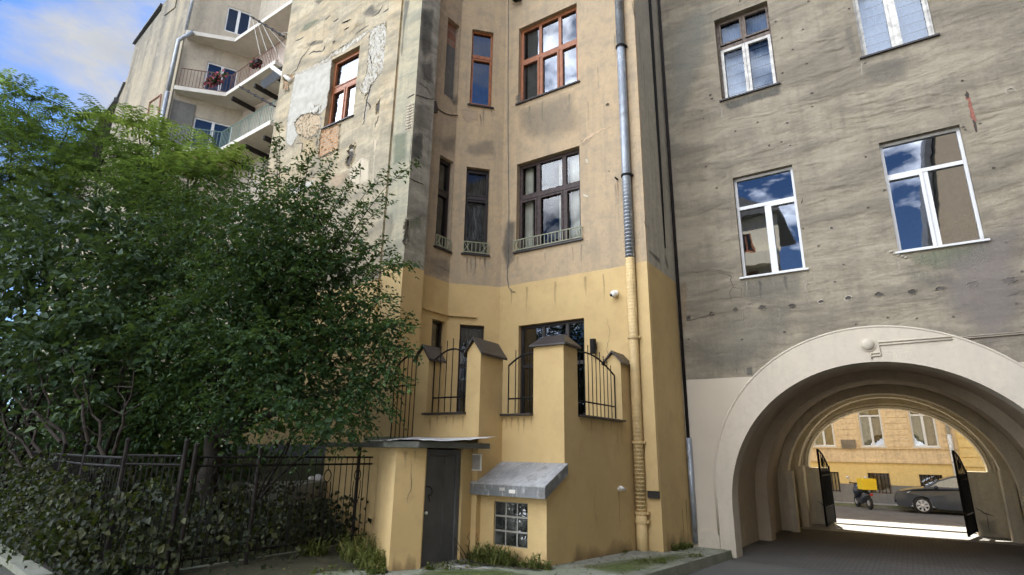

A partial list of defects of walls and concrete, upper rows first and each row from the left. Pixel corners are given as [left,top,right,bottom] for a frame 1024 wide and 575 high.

flaking render [282,21,387,169]
corrosion [965,91,977,132]